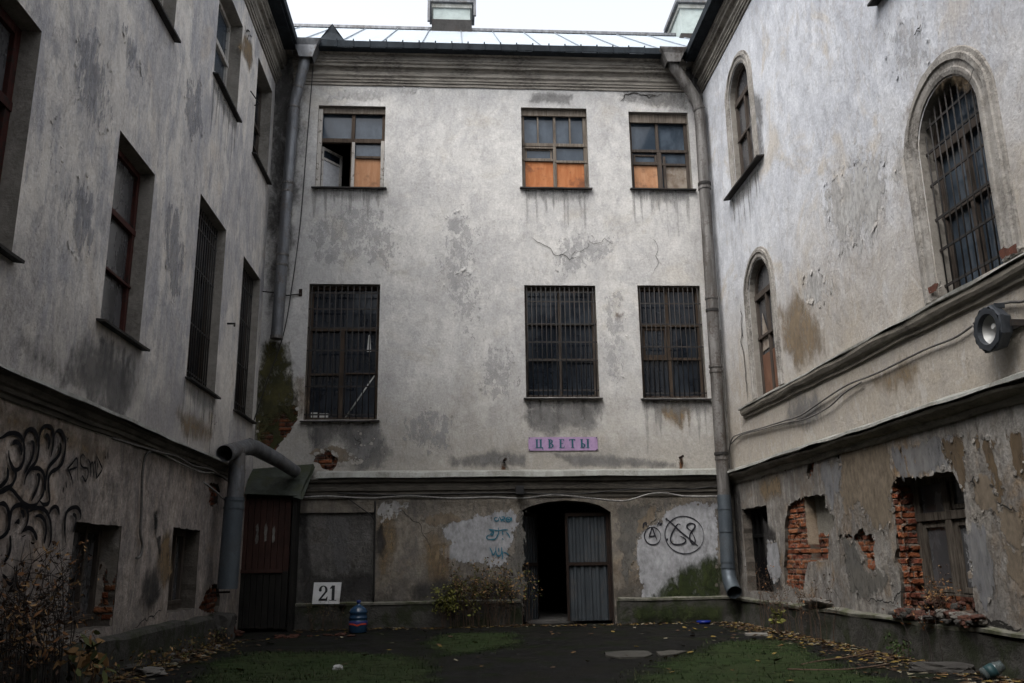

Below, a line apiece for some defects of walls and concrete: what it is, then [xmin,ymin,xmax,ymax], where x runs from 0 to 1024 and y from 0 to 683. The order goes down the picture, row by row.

crack [534,239,615,260]
damp [781,295,821,367]
flaking render [310,431,375,471]
peeling [766,429,1024,628]
flaking render [199,584,217,614]